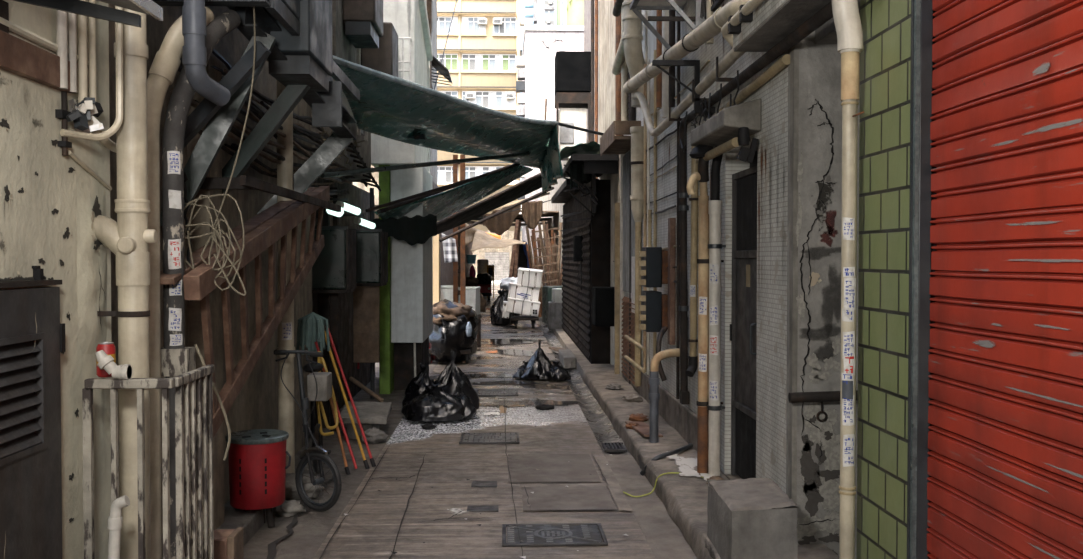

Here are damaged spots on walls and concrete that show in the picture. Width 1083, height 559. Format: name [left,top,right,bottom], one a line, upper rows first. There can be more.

peeling [91,195,102,252]
peeling [0,258,54,282]
crack [800,98,837,457]